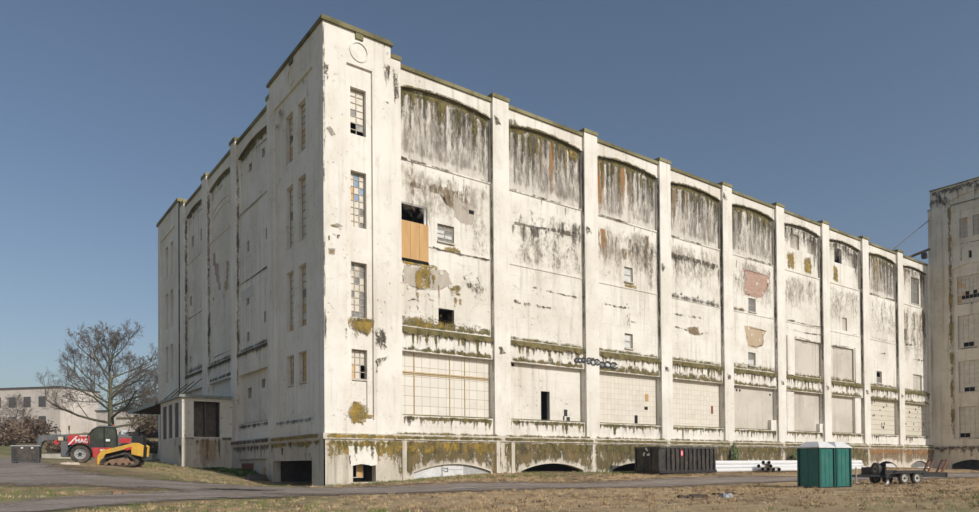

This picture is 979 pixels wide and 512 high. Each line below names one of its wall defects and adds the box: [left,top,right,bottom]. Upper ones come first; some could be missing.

leakage [384,65,492,212]
leakage [510,133,583,270]
leakage [598,162,659,223]
leakage [930,179,979,212]
flaking render [402,260,462,306]
leakage [598,229,659,295]
spalling [743,268,770,298]
leakage [671,189,926,350]
spalling [744,326,767,348]